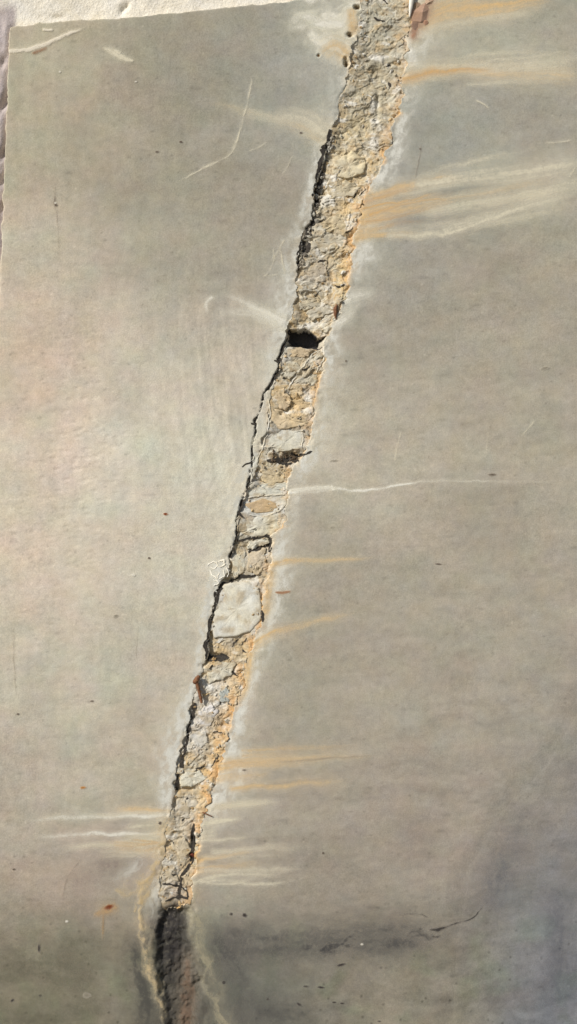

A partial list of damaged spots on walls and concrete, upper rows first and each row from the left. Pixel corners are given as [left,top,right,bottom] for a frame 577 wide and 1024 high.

rust [409,0,541,40]
rust [401,53,572,85]
crack [296,129,332,271]
rust [354,156,574,242]
spalling [158,0,412,910]
crack [203,338,312,662]
crack [174,703,197,790]
crack [162,823,195,902]
leakage [129,875,433,1024]